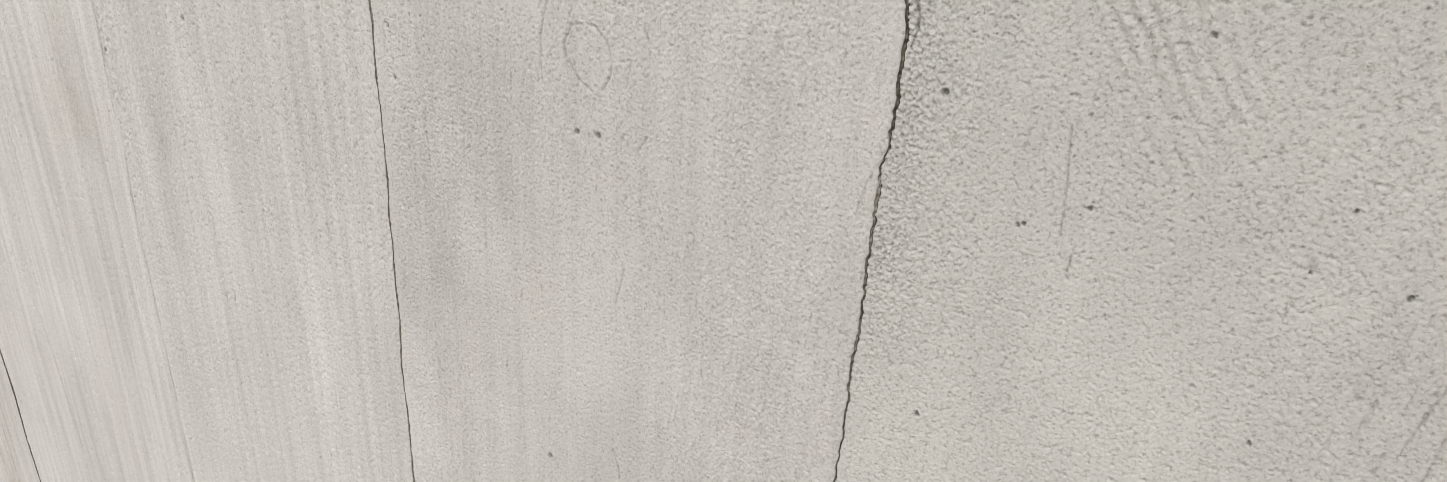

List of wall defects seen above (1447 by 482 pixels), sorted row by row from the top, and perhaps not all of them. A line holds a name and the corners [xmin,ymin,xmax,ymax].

crack [833,0,919,482]